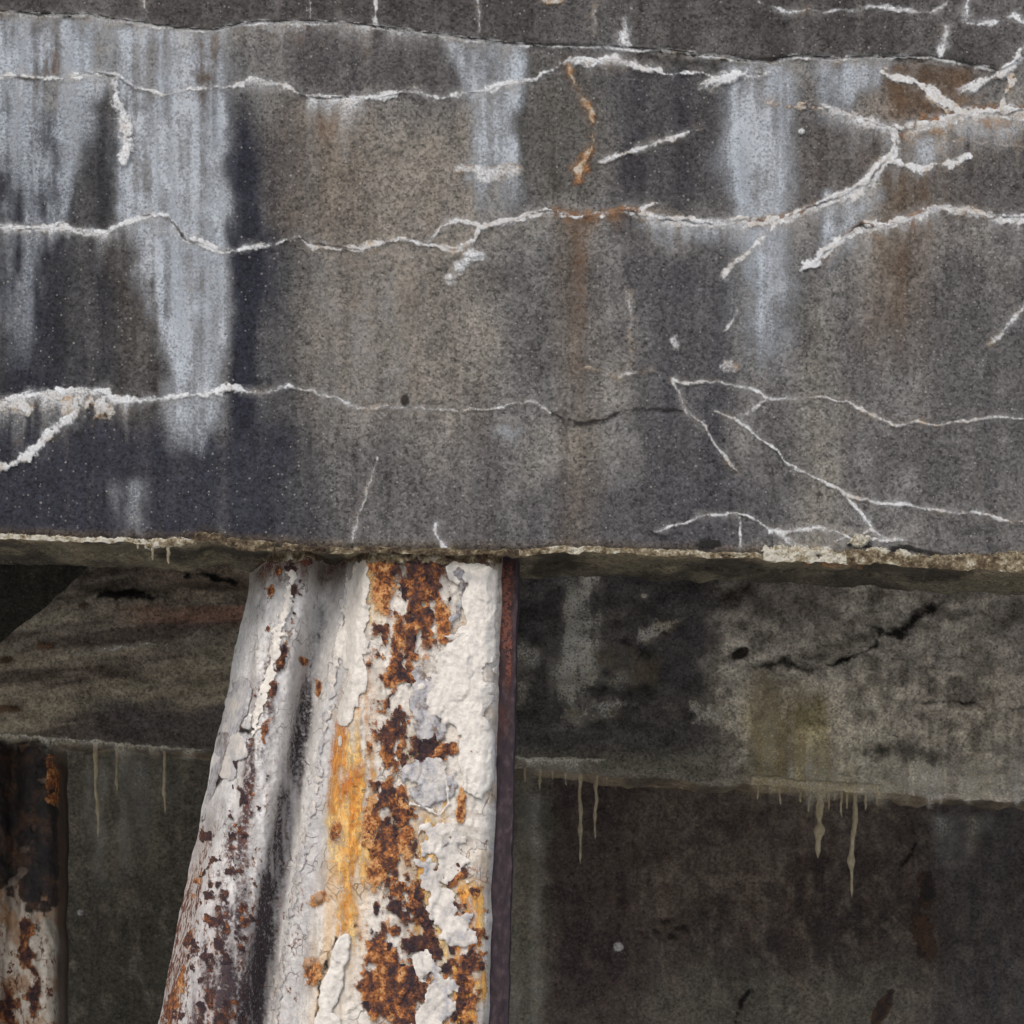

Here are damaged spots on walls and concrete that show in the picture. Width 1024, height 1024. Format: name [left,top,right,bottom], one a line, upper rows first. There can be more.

leakage [0,18,232,444]
leakage [445,248,485,285]
leakage [448,42,527,196]
crack [0,0,1024,278]
efflorescence [618,25,631,49]
leakage [721,63,805,350]
crack [990,308,1024,345]
crack [0,378,1023,550]
leakage [549,576,627,724]
crack [761,603,936,671]
rust [306,553,489,1024]
peeling [0,531,1024,1024]